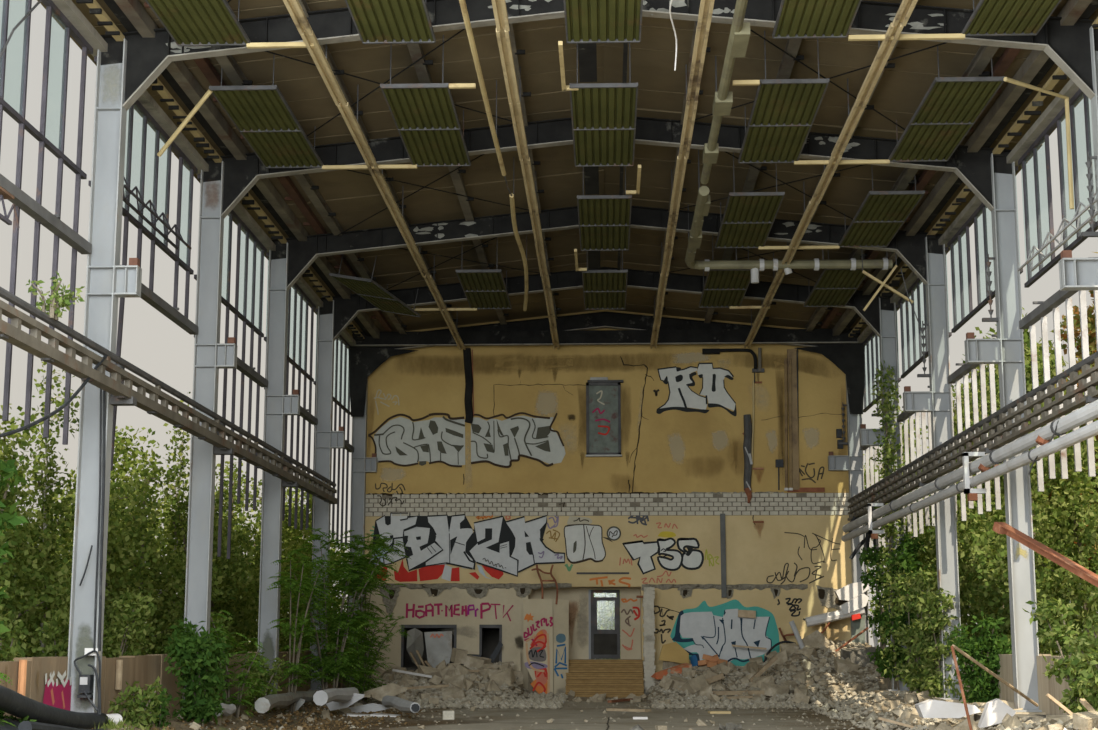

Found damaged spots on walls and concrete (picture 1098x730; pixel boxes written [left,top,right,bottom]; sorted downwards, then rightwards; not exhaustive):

peeling [505,0,551,11]
crack [620,356,654,498]